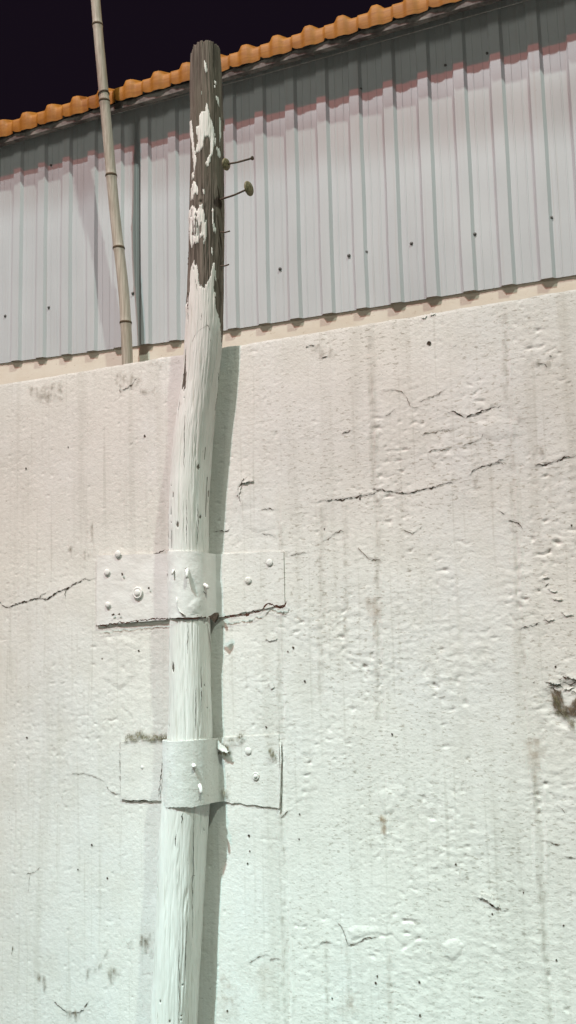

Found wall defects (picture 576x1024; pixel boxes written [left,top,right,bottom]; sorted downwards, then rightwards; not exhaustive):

peeling [188,61,221,255]
crack [320,390,503,501]
crack [2,579,84,608]
spalling [533,666,576,725]